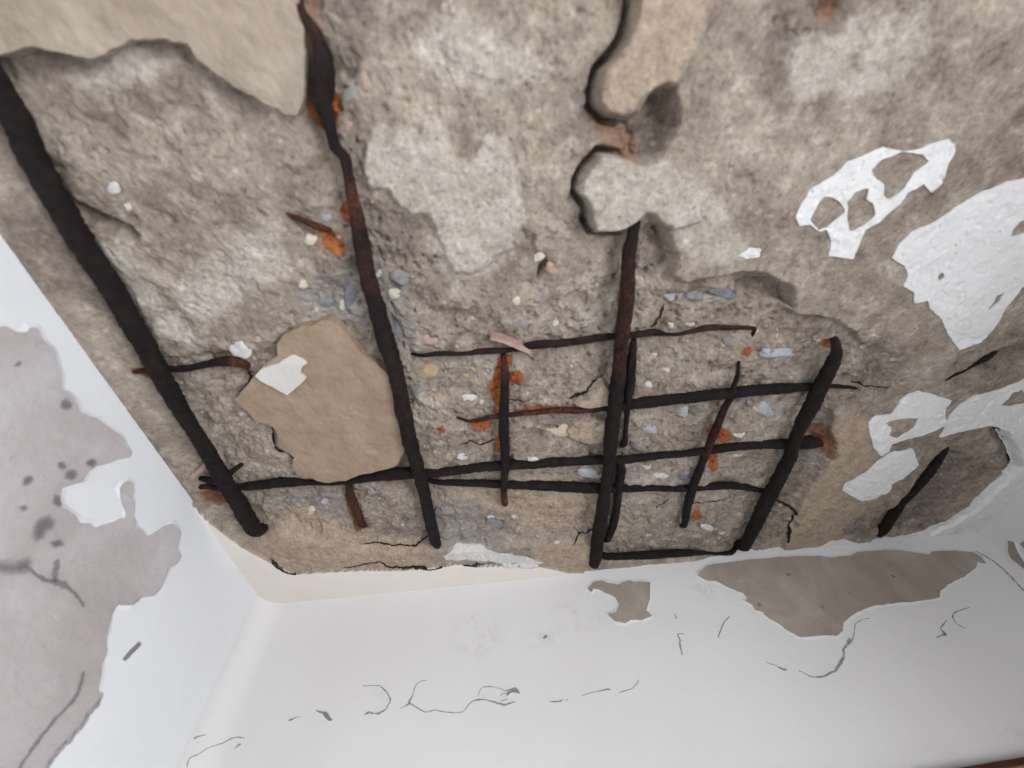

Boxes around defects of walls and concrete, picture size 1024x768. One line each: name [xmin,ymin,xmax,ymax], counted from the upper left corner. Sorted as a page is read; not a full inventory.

peeling [795,139,955,259]
corrosion [320,231,345,255]
spalling [0,0,870,574]
peeling [892,178,1024,385]
corrosion [471,355,524,452]
corrosion [707,424,732,443]
corrosion [201,490,226,505]
peeling [0,321,183,768]
crack [344,535,520,571]
crack [767,618,870,678]
crack [936,607,970,638]
crack [365,680,515,715]